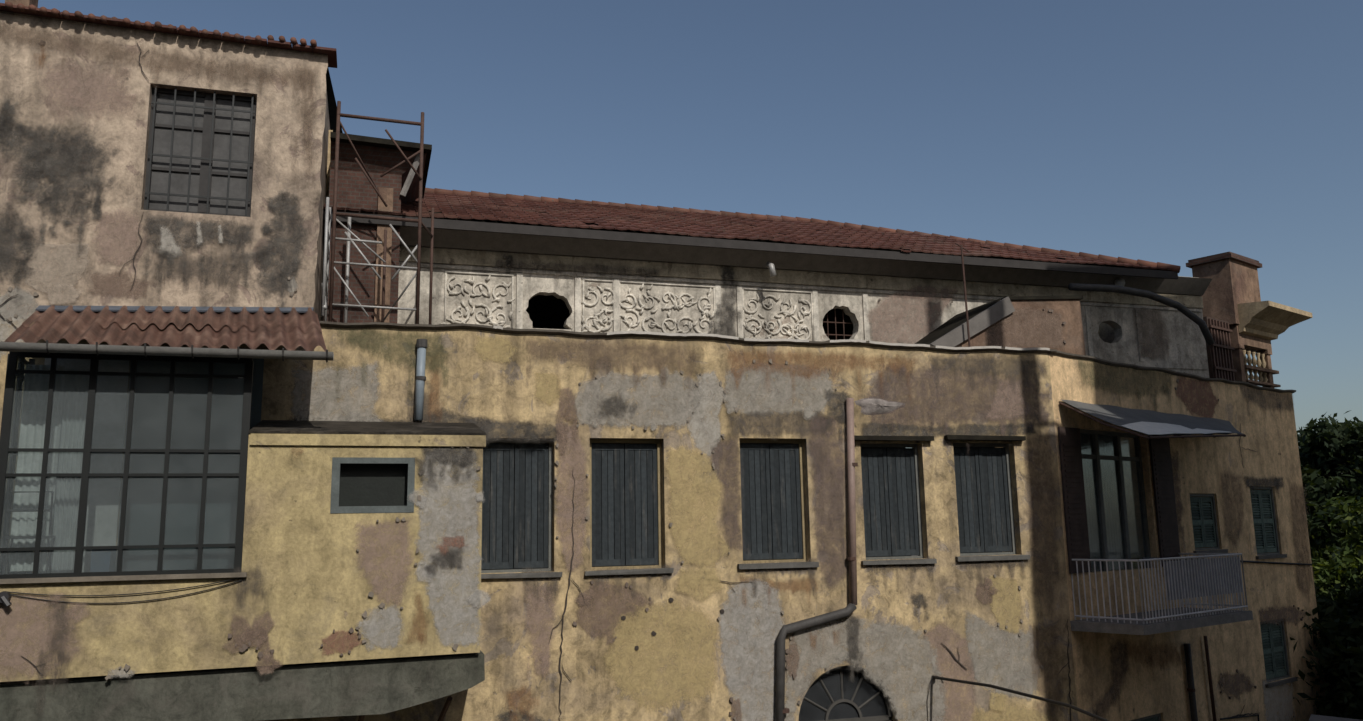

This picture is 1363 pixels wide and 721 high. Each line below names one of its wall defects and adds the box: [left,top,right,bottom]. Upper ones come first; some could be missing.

water stain [0,101,117,282]
water stain [146,192,308,306]
water stain [709,266,741,336]
flaking render [409,446,491,651]
crack [549,473,585,721]
flaking render [717,580,975,721]